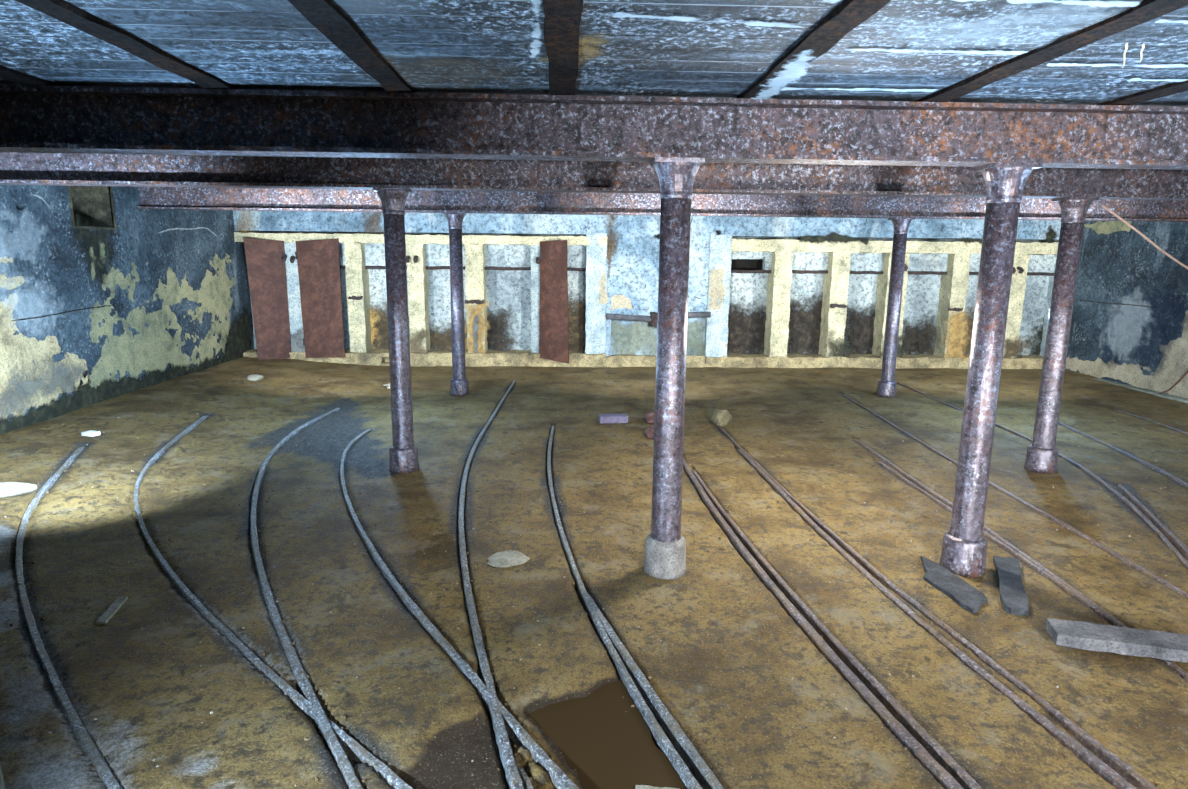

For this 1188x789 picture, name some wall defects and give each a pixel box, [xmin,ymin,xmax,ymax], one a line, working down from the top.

efflorescence [752,51,937,99]
peeling [1084,221,1132,234]
peeling [0,252,236,419]
damp [370,303,389,350]
damp [408,315,468,353]
damp [487,309,515,351]
damp [568,296,585,351]
damp [611,320,657,355]
damp [727,304,766,354]
damp [787,293,883,358]
damp [897,311,936,358]
peeling [1065,310,1188,398]